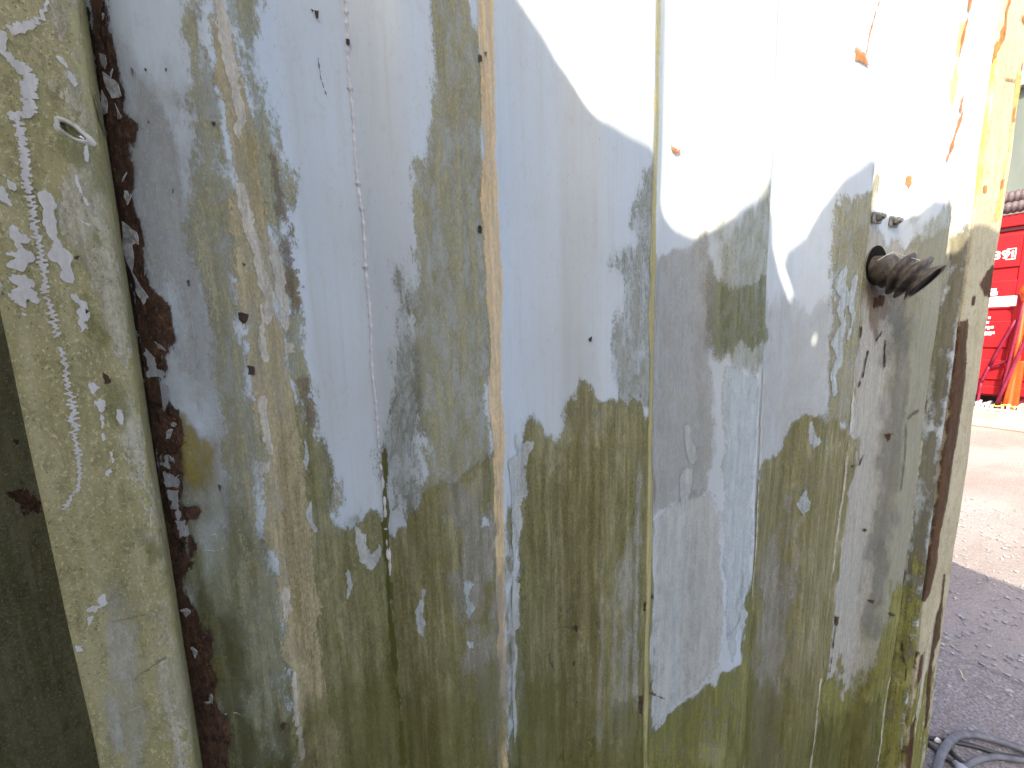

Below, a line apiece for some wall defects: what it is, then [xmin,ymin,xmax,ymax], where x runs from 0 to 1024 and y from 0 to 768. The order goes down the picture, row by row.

rust [86,2,118,101]
rust [855,1,880,67]
rust [991,0,1011,65]
peeling [0,0,165,567]
rust [972,265,994,306]
rust [126,265,213,616]
leakage [450,0,509,768]
leakage [613,0,795,768]
peeling [86,594,117,626]
peeling [149,585,198,768]
peeling [726,574,748,640]
rust [901,319,969,768]